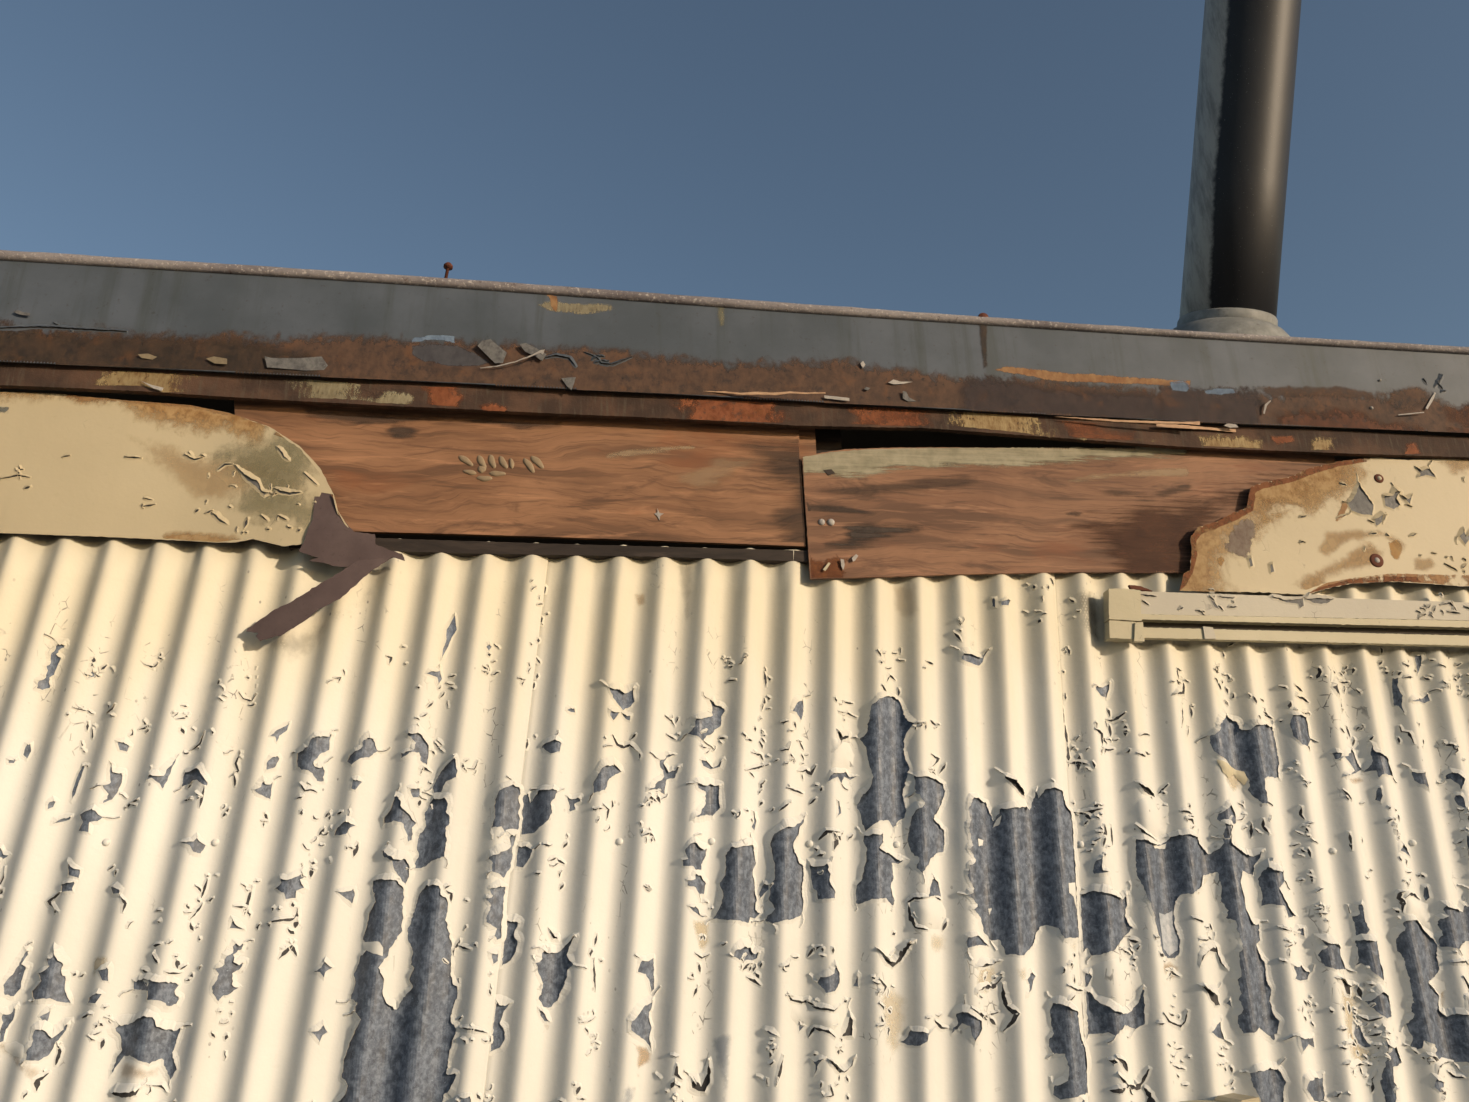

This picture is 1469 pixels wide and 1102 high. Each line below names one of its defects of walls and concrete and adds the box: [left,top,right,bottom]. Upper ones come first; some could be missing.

corrosion [0,321,1469,454]
peeling [1342,460,1437,527]
peeling [32,633,70,694]
peeling [598,679,640,723]
peeling [45,737,212,835]
peeling [0,940,192,1102]
peeling [209,915,255,1004]
peeling [251,720,474,1102]
peeling [488,994,514,1056]
peeling [482,756,625,1024]
peeling [626,953,662,1054]
peeling [645,691,1469,1102]